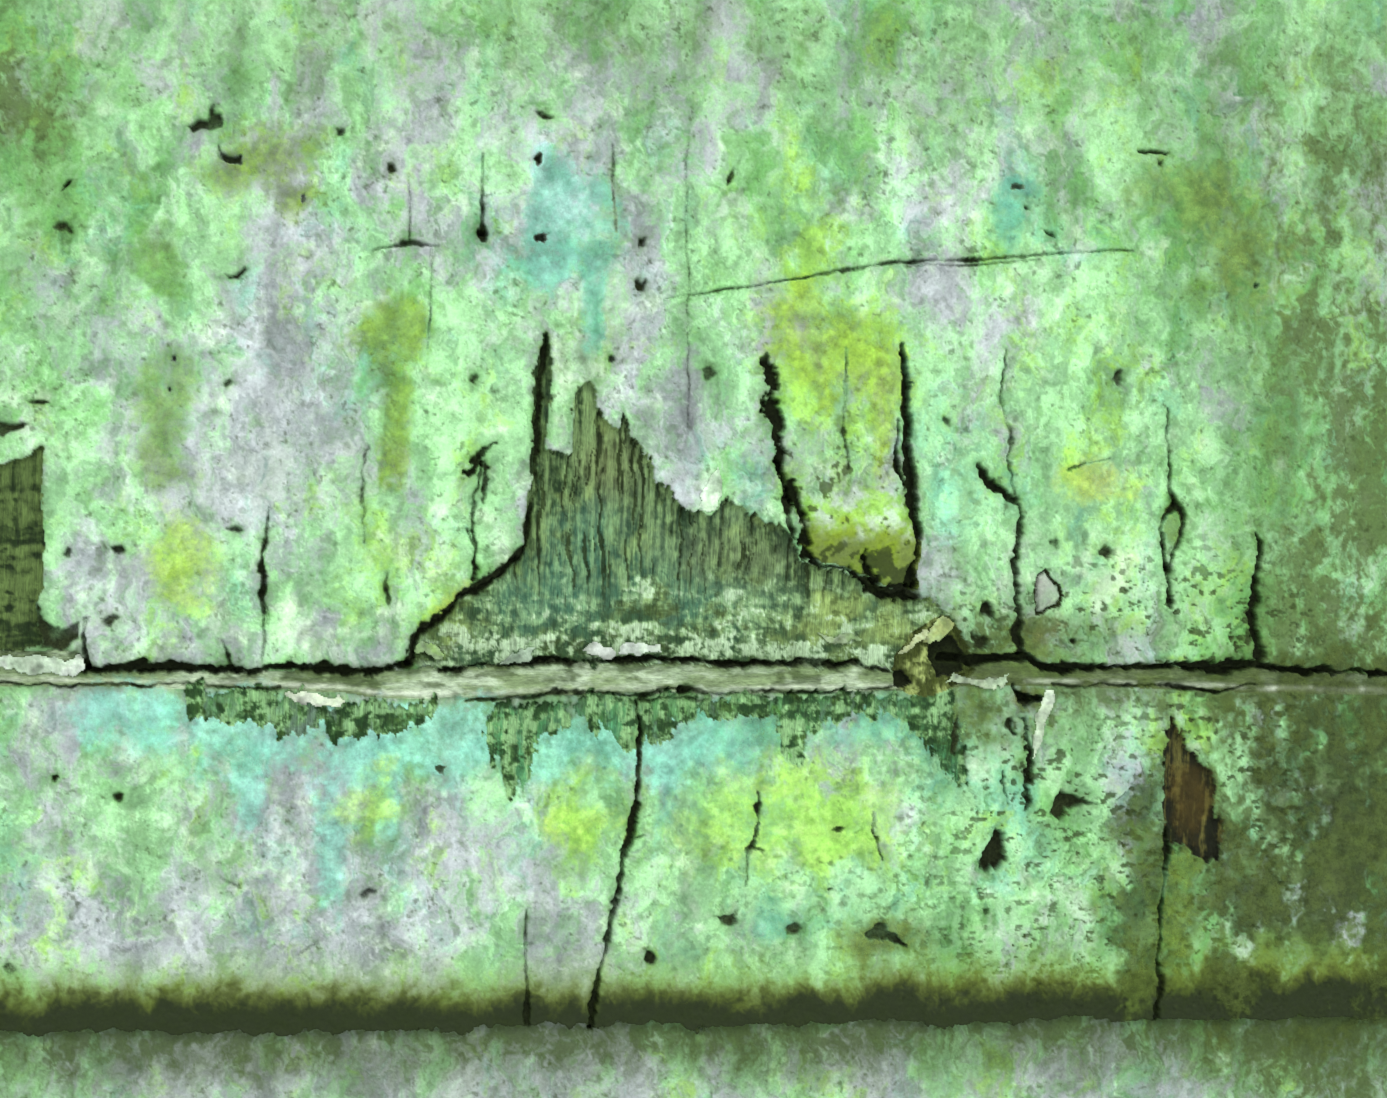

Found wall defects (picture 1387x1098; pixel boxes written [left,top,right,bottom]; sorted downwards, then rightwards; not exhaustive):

crack [665,136,1132,428]
peeling [0,446,85,677]
peeling [403,334,1055,800]
crack [759,343,921,603]
crack [935,350,1387,811]
peeling [185,677,438,746]
crack [0,508,892,1029]
peeling [1162,717,1224,863]
crack [1153,828,1171,1019]